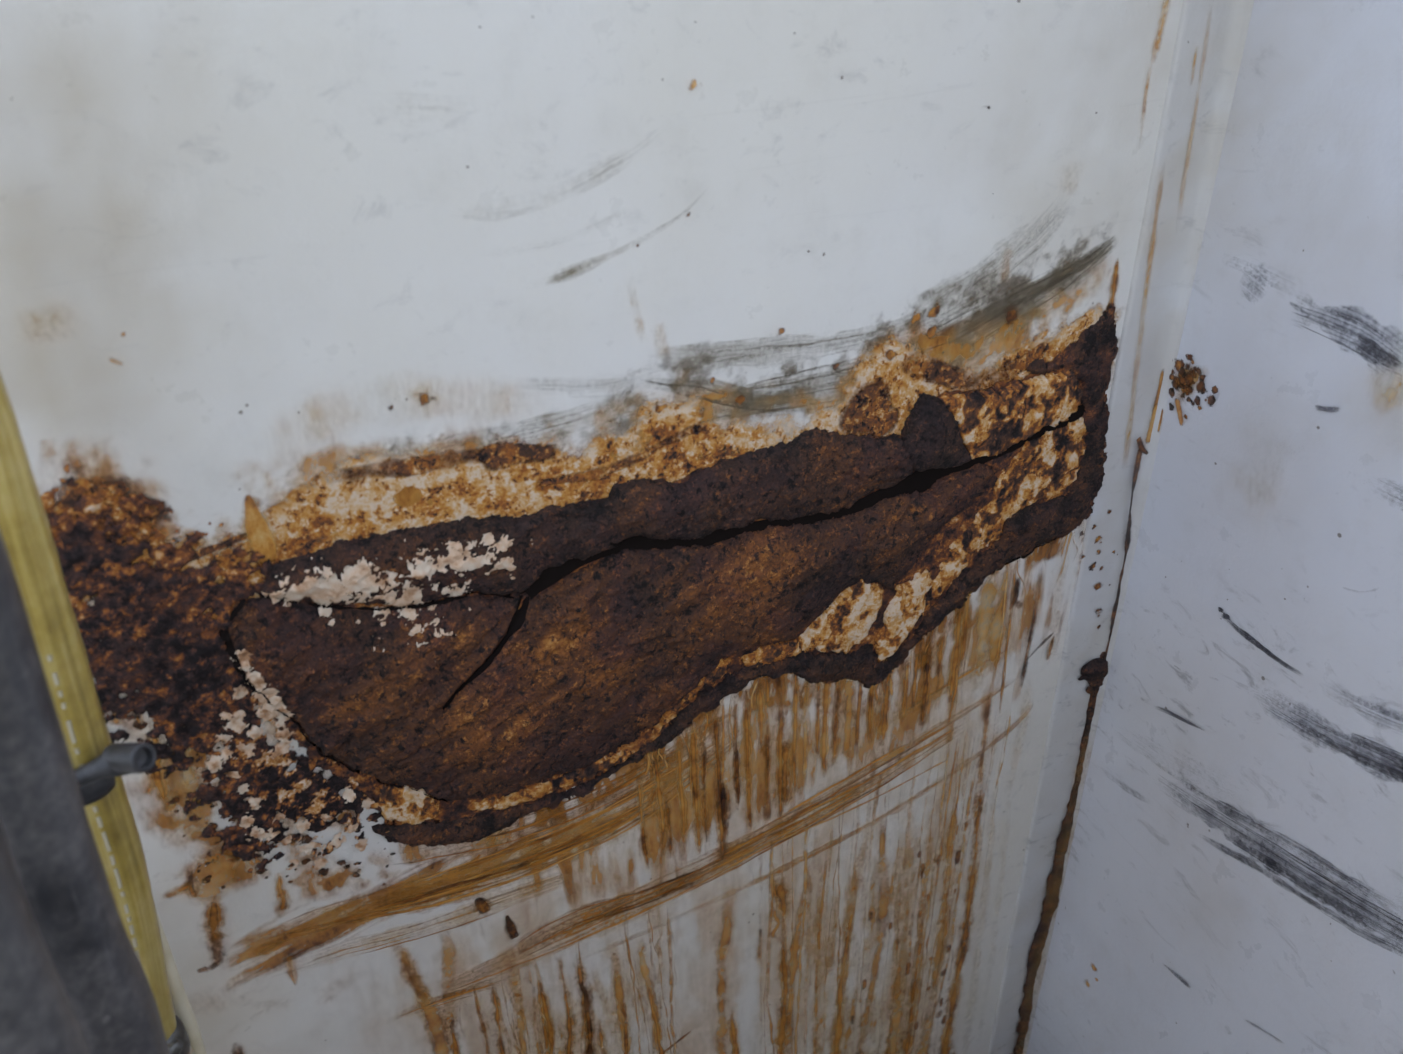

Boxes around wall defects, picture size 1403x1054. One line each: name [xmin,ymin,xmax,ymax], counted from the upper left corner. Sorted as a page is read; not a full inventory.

rust [41,262,1119,1054]
crack [218,404,1085,803]